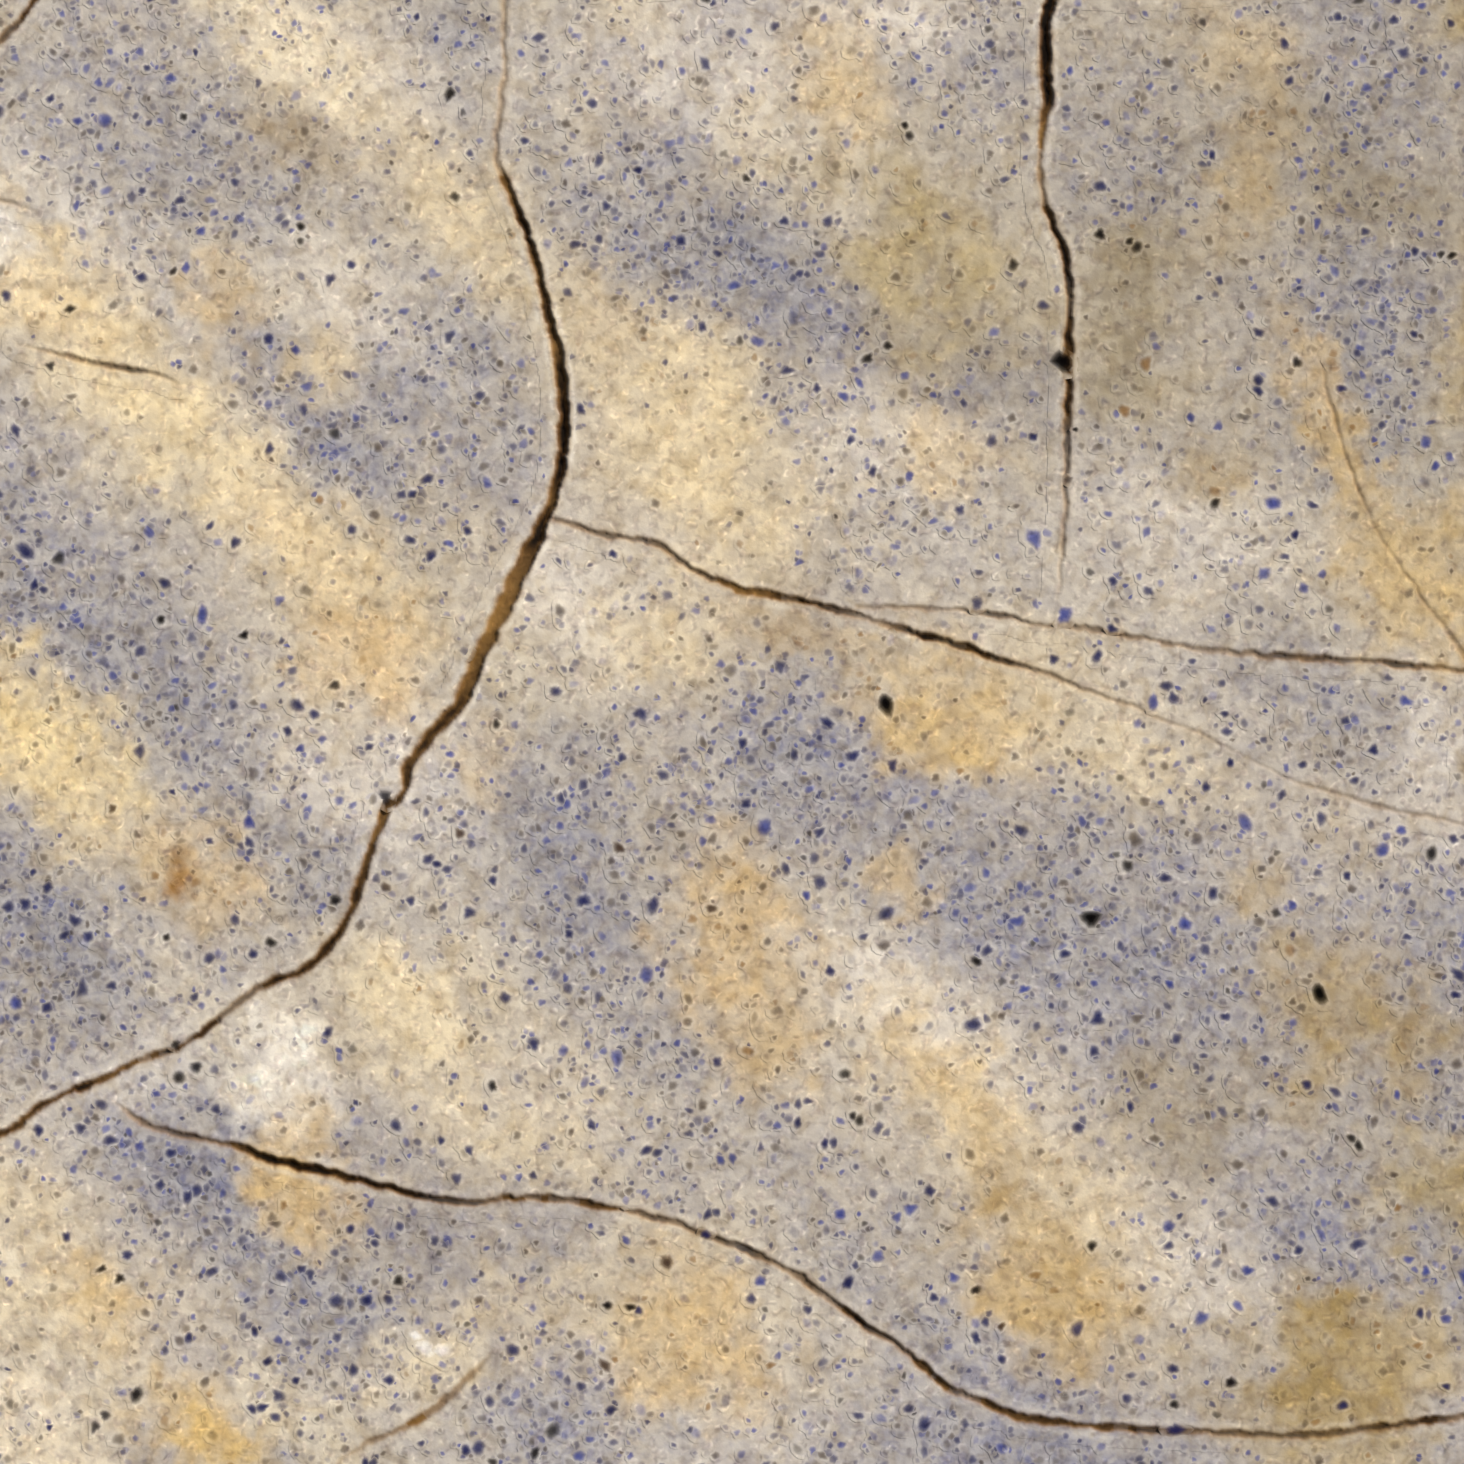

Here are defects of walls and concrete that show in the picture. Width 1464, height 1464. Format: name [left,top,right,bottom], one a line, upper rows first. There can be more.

crack [0,0,1464,1154]
crack [104,1090,1464,1464]